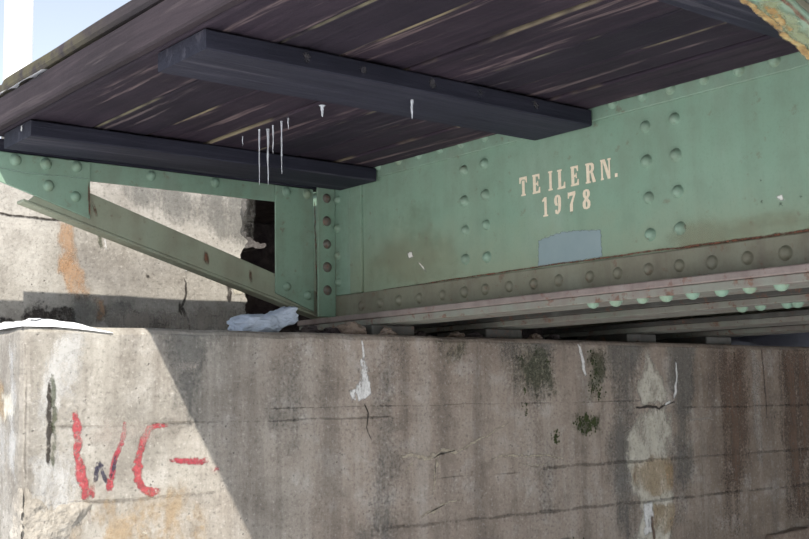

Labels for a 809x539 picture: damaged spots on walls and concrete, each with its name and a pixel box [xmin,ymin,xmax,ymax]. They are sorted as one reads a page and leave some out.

rust [740,0,809,60]
rust [58,224,87,299]
crack [179,279,197,329]
crack [402,423,507,518]
crack [636,401,674,409]
damp [713,348,809,518]